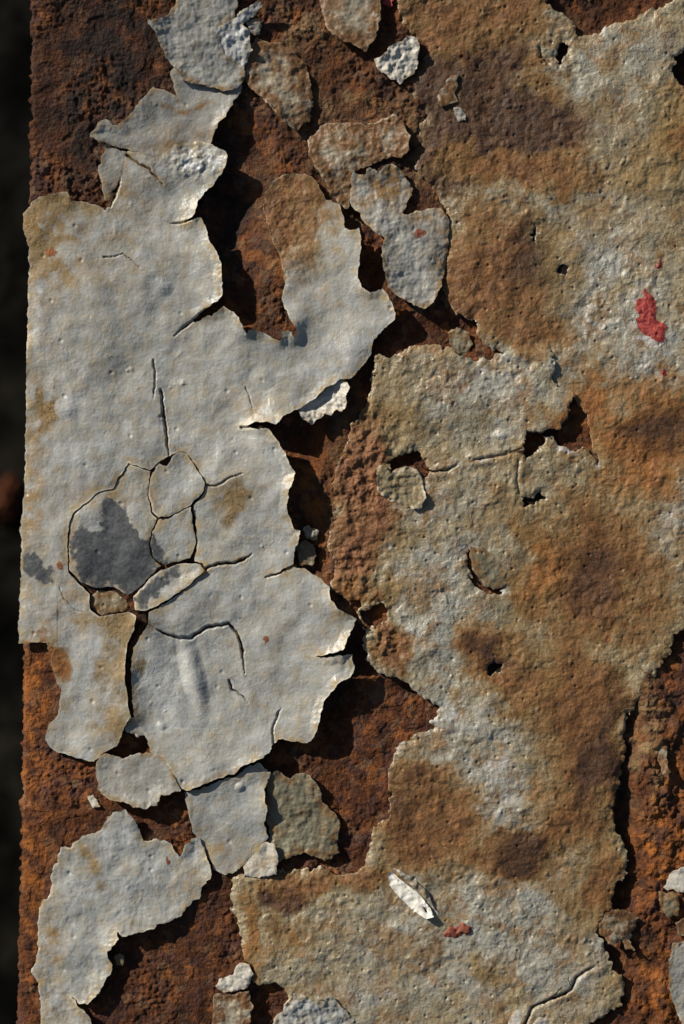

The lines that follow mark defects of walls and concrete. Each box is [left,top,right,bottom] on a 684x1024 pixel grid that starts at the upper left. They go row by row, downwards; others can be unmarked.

rust [264,173,330,267]
spalling [523,398,599,465]
crack [67,360,250,717]
rust [212,481,251,526]
peeling [18,0,499,1024]
rust [21,629,72,681]
rust [85,613,145,690]
rust [239,362,684,983]
spalling [590,630,684,1024]
crack [524,968,592,1024]